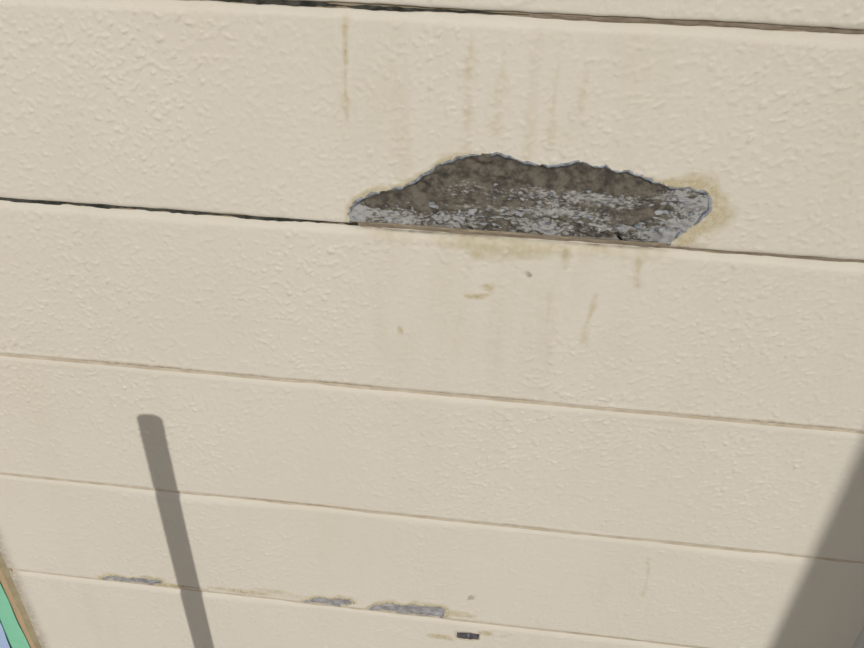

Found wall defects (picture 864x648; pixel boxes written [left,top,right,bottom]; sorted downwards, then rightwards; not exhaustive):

spalling [347,152,712,244]
peeling [103,576,163,585]
peeling [304,597,355,607]
peeling [368,603,445,618]